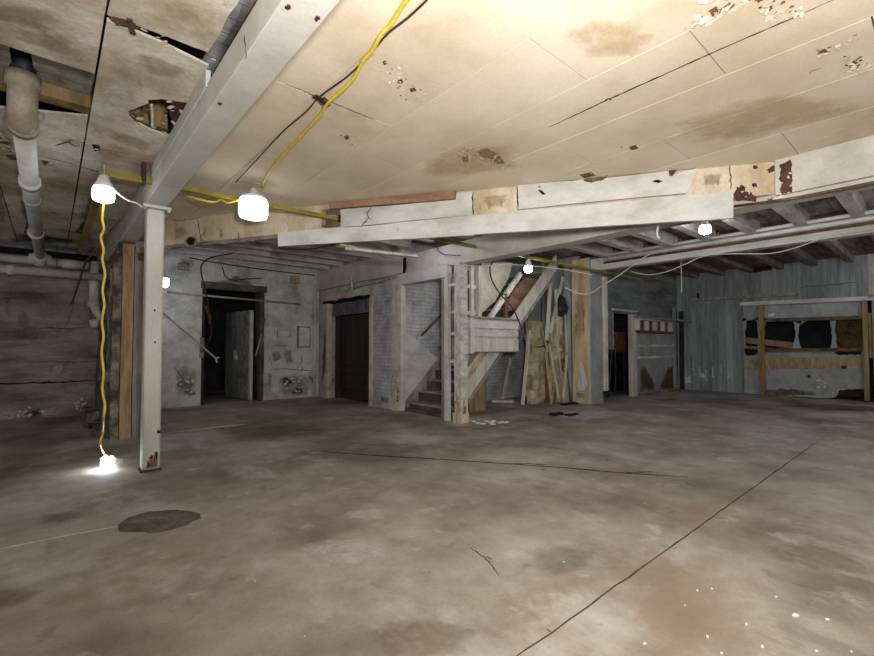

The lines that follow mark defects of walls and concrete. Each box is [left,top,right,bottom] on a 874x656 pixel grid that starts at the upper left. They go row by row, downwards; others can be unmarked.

peeling [685,0,804,31]
spalling [129,101,187,136]
crack [312,450,683,477]
crack [516,434,827,656]